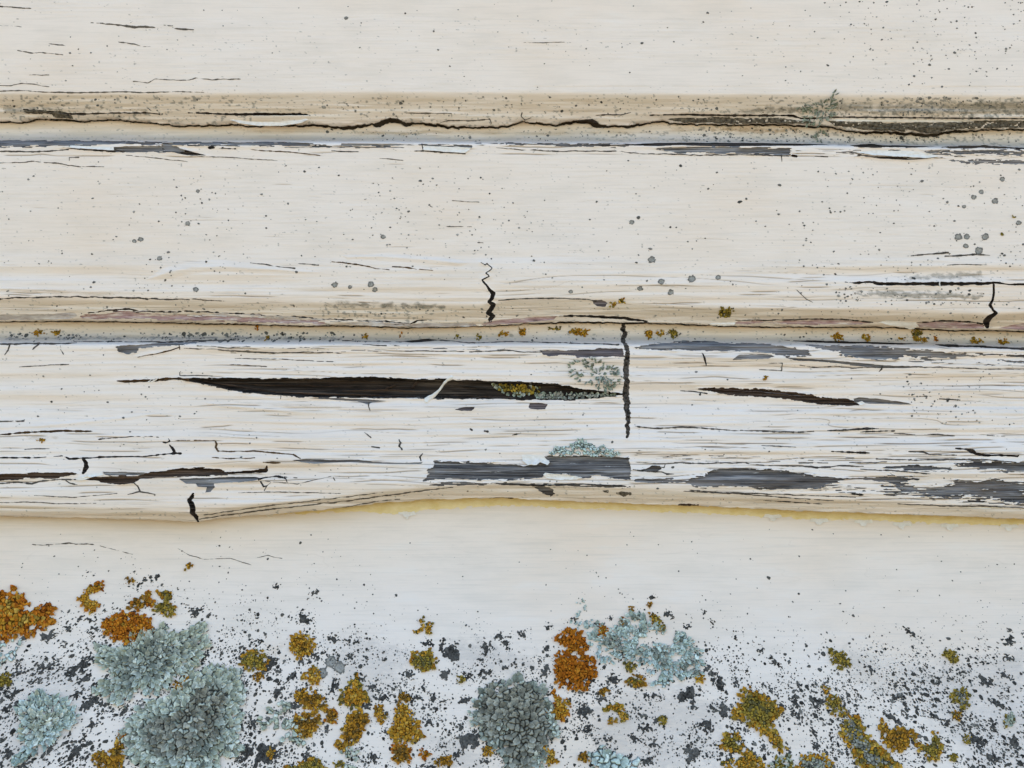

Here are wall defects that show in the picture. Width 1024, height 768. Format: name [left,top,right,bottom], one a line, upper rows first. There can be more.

crack [409,112,492,124]
crack [596,111,1024,119]
peeling [0,140,630,153]
crack [0,200,648,383]
crack [846,252,1024,328]
crack [0,420,453,522]
peeling [294,450,1024,505]